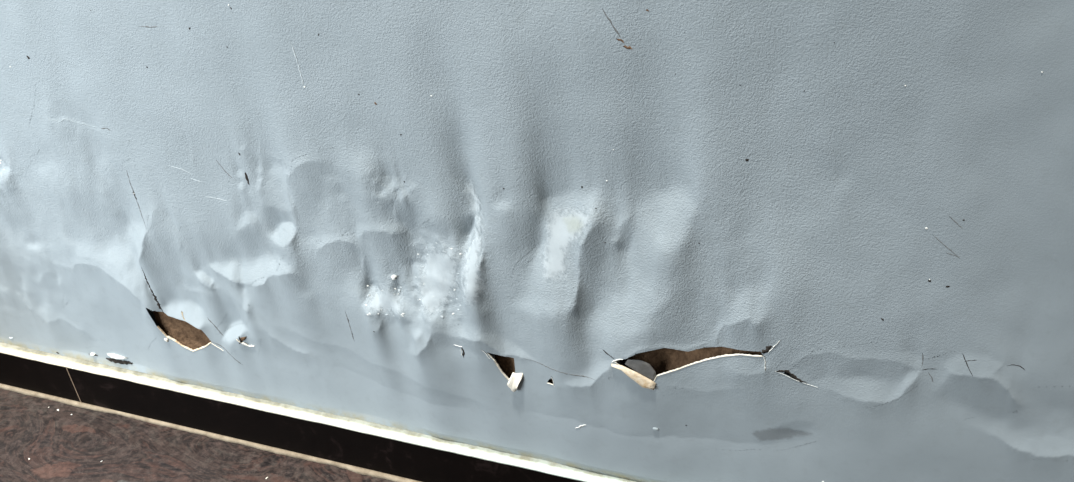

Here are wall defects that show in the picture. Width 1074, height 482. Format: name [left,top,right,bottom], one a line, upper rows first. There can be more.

water stain [419,188,481,312]
water stain [544,213,587,278]
water stain [370,288,399,312]
flaking render [151,310,211,350]
flaking render [495,354,515,378]
flaking render [625,347,762,376]